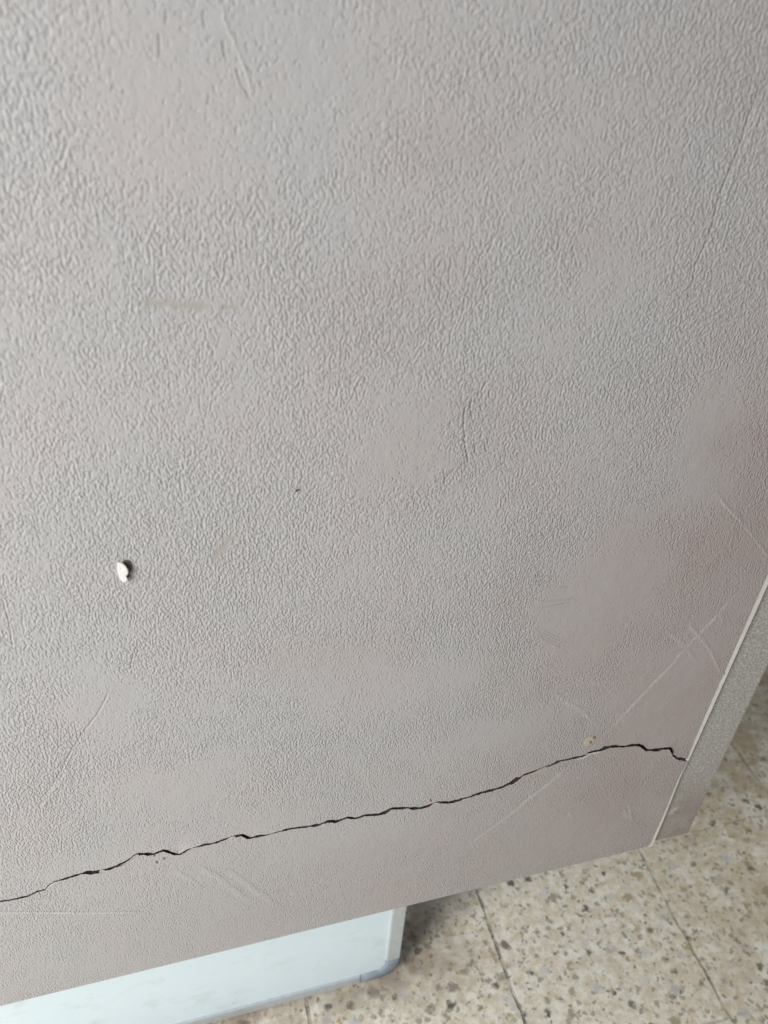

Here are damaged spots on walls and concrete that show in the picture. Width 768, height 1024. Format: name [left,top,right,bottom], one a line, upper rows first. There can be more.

crack [0,744,686,902]